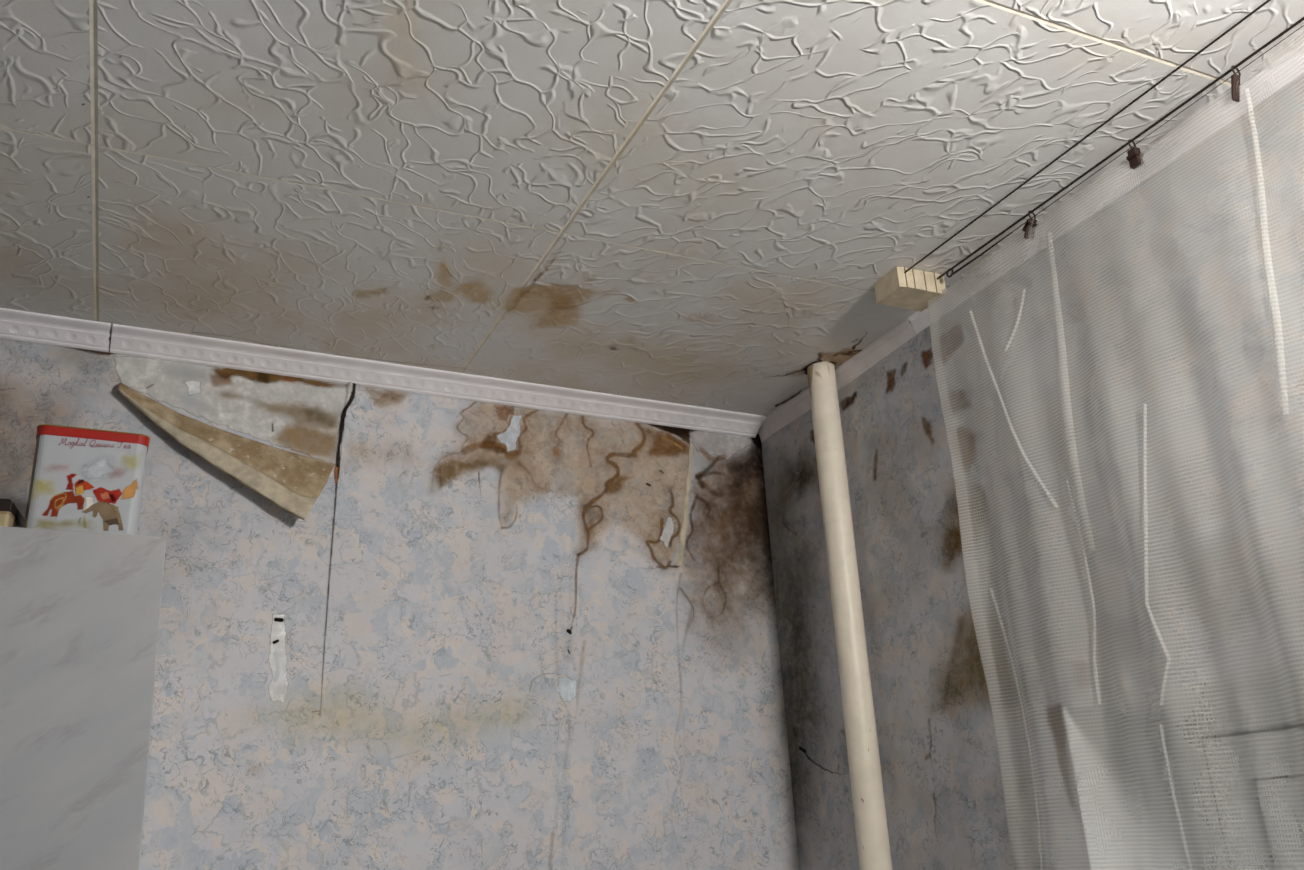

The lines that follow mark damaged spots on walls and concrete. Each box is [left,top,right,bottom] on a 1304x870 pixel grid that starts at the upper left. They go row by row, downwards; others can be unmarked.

damp [507,260,594,327]
flaking render [113,355,353,464]
damp [945,488,982,565]
damp [437,401,821,826]
damp [943,620,1006,704]